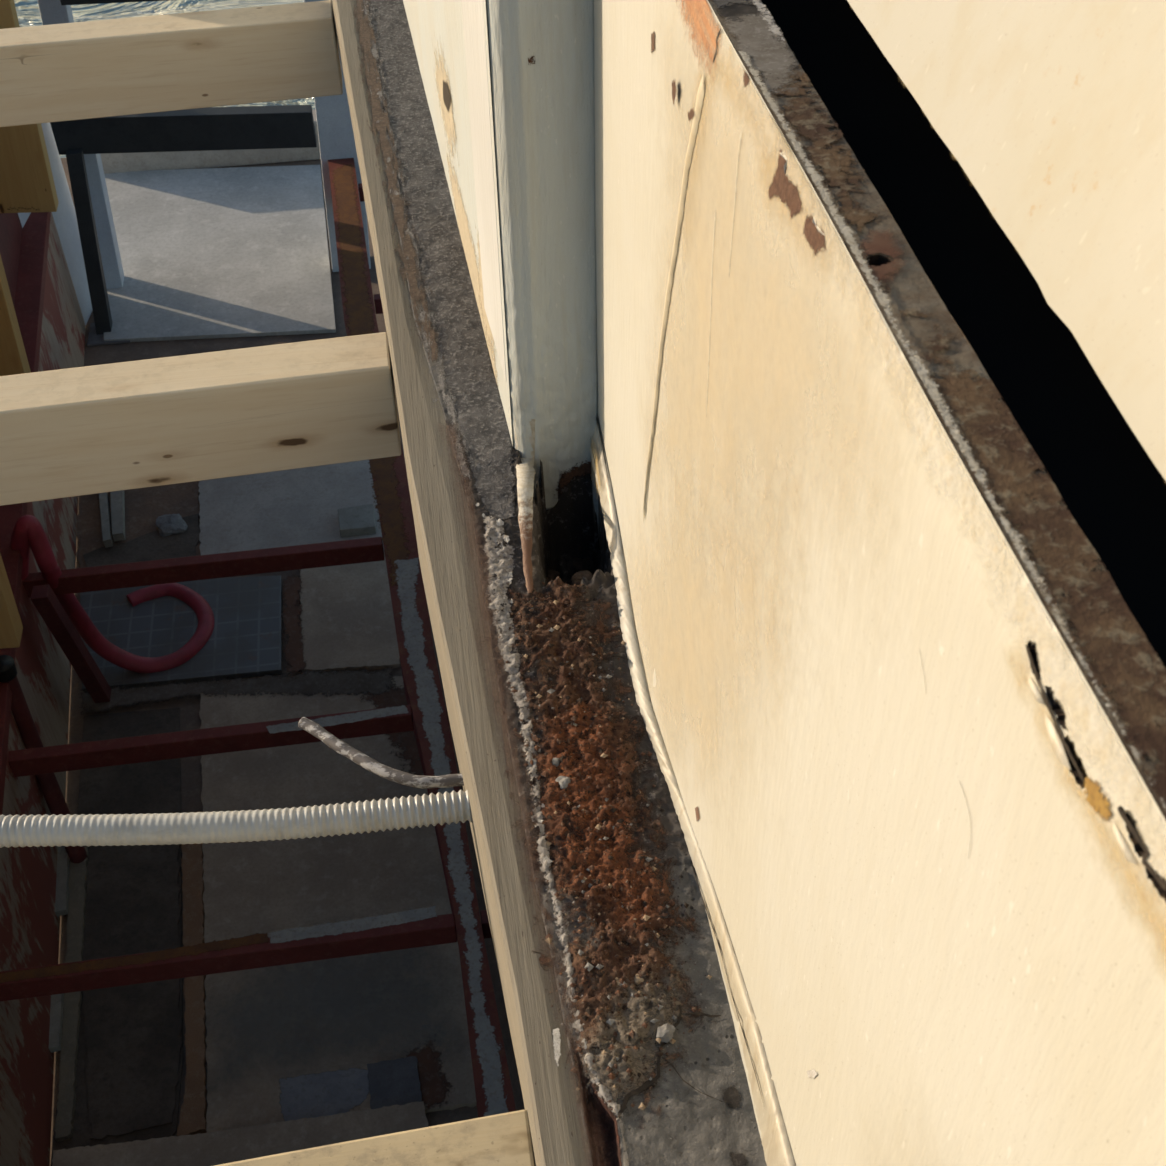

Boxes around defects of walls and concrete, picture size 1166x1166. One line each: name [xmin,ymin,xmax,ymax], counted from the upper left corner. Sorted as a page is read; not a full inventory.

rust [643,0,720,519]
rust [771,64,885,233]
rust [898,309,1166,812]
leakage [475,503,624,1122]
crack [617,863,763,1118]